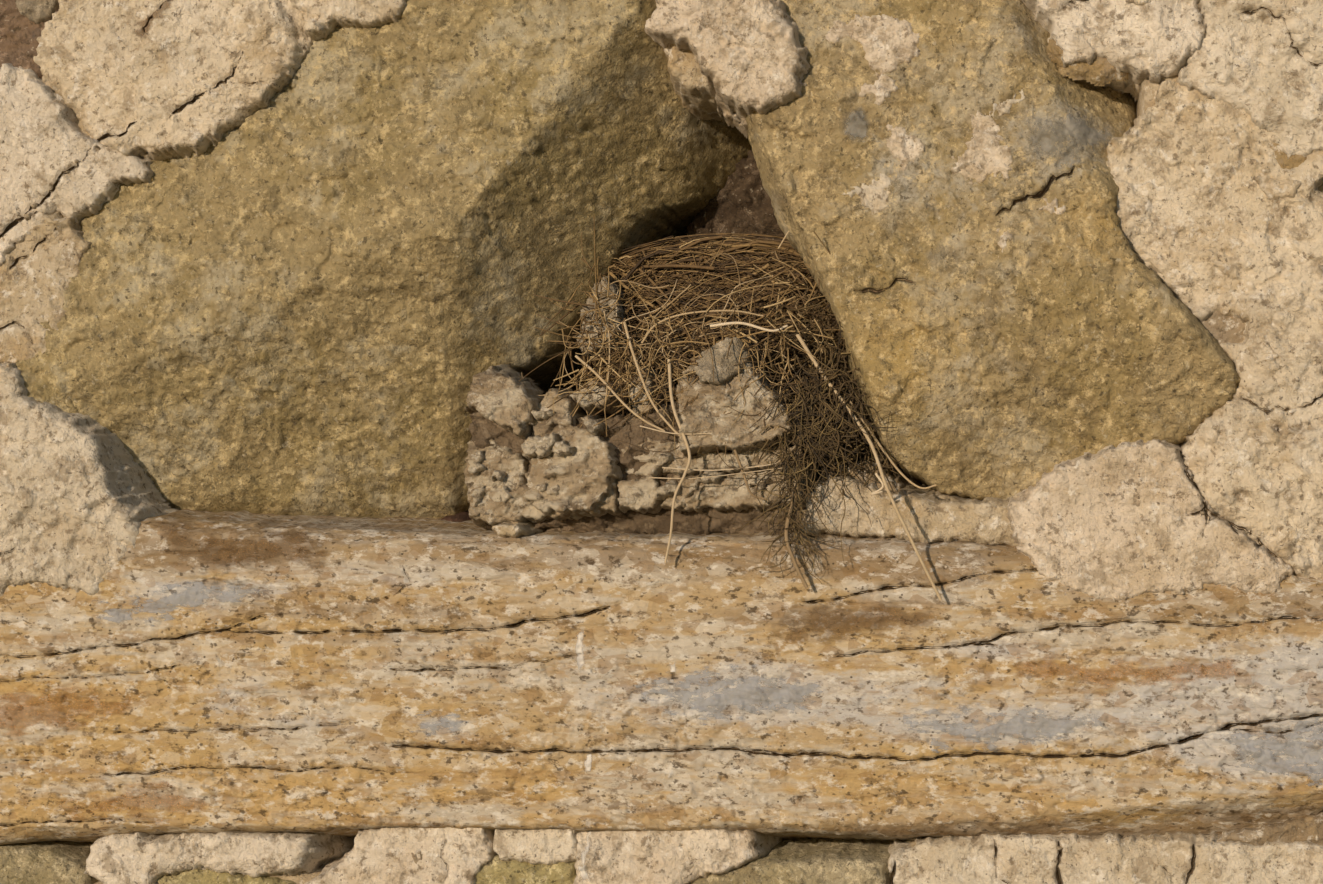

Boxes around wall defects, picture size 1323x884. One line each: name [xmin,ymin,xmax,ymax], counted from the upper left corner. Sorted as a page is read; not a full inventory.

crack [142,0,169,33]
crack [1242,7,1322,66]
crack [0,50,277,269]
crack [1240,372,1323,444]
crack [1179,451,1278,558]
crack [0,565,612,682]
crack [834,616,1315,657]
crack [106,714,1323,776]
crack [1055,841,1063,884]